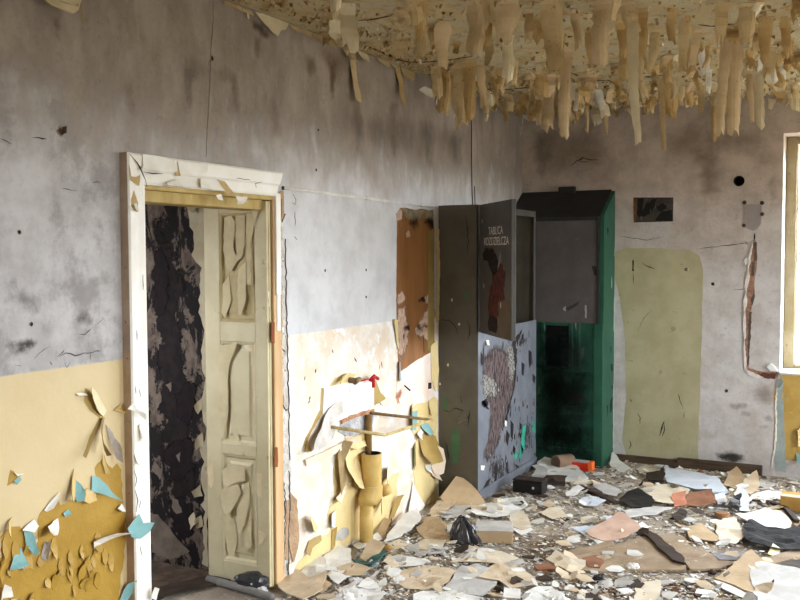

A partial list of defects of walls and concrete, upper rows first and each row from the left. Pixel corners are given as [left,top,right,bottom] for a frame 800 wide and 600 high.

peeling [223,0,800,152]
peeling [129,154,248,212]
crack [17,318,104,367]
peeling [279,190,446,577]
peeling [743,233,800,472]
peeling [0,387,154,600]